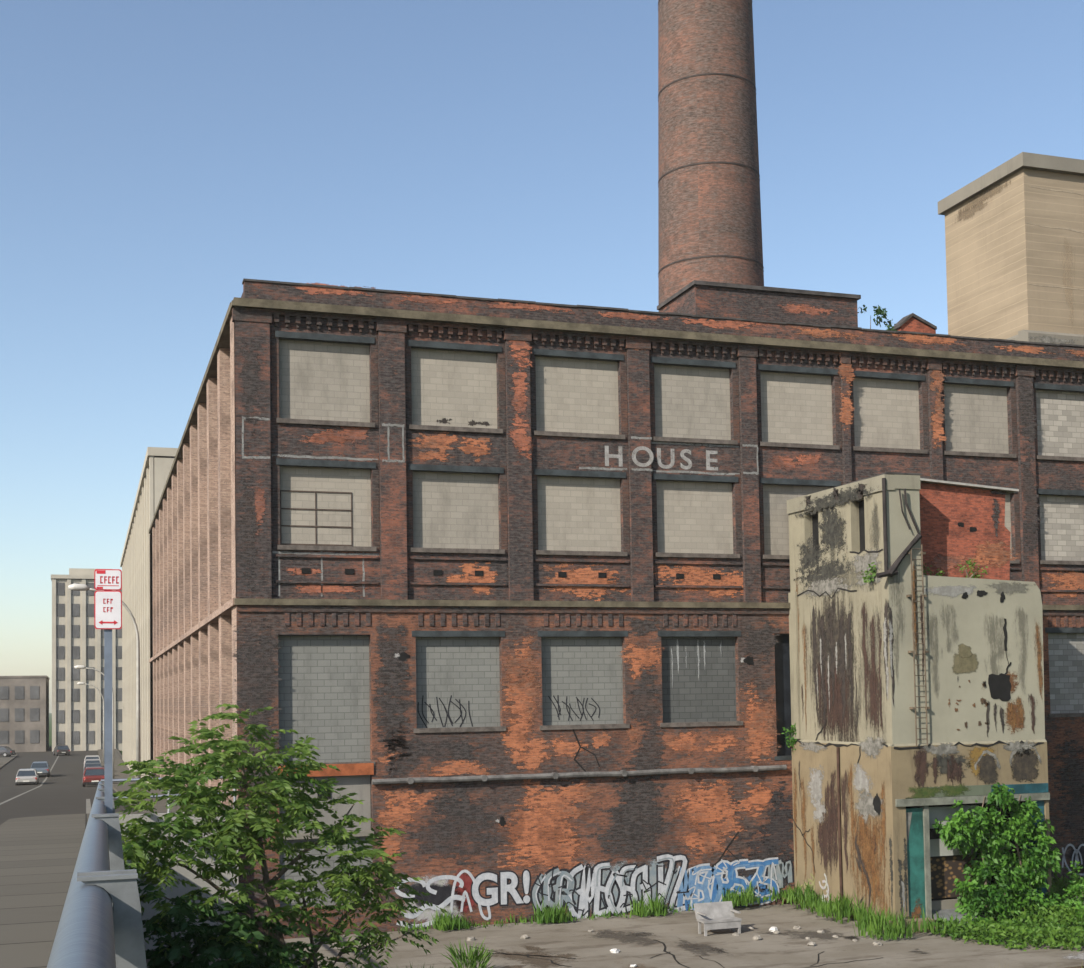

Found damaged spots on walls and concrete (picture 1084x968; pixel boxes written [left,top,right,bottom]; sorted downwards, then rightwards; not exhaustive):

spalling [299,426,372,446]
spalling [407,432,492,463]
spalling [507,340,533,459]
spalling [620,640,662,679]
water stain [741,618,782,664]
water stain [794,483,878,742]
spalling [492,637,611,877]
spalling [664,681,781,764]
spalling [376,760,491,862]
spalling [667,779,779,859]
crack [469,946,576,967]
crack [651,939,724,968]